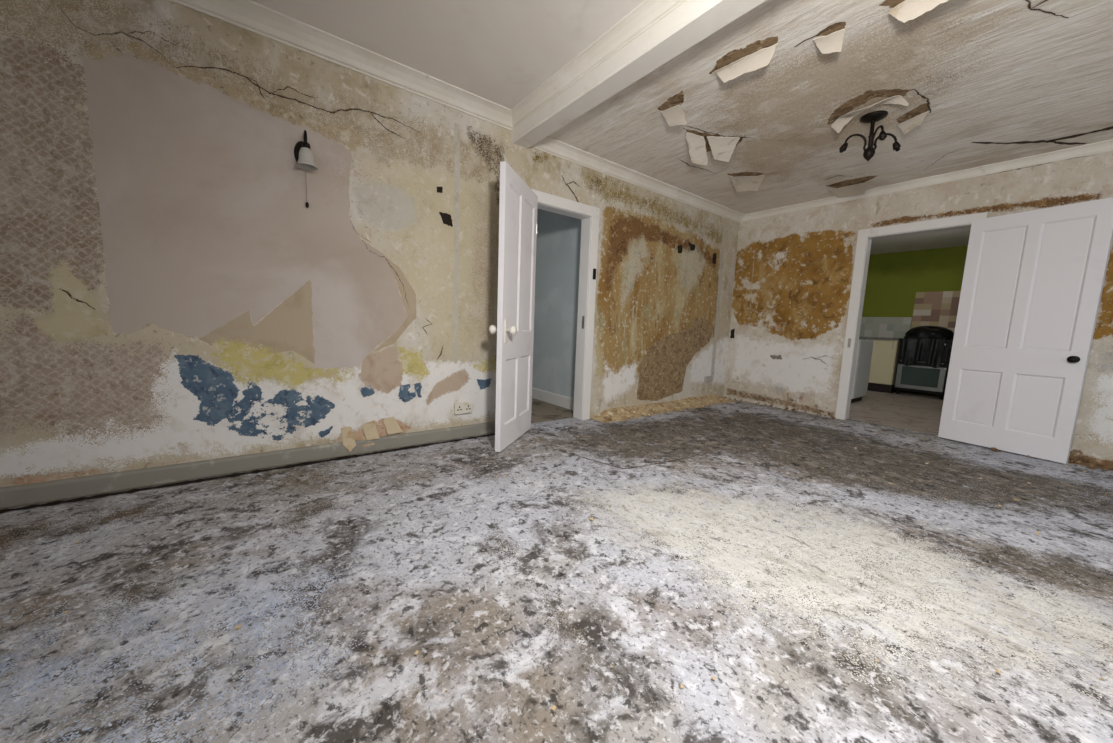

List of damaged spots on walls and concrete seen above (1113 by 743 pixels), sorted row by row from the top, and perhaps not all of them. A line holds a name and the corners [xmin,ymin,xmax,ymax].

peeling [879,0,949,23]
crack [61,9,420,138]
peeling [709,36,778,83]
peeling [795,22,846,54]
peeling [828,89,932,134]
crack [926,126,1113,175]
peeling [826,175,878,197]
flaking render [439,212,453,227]
flaking render [0,346,496,485]